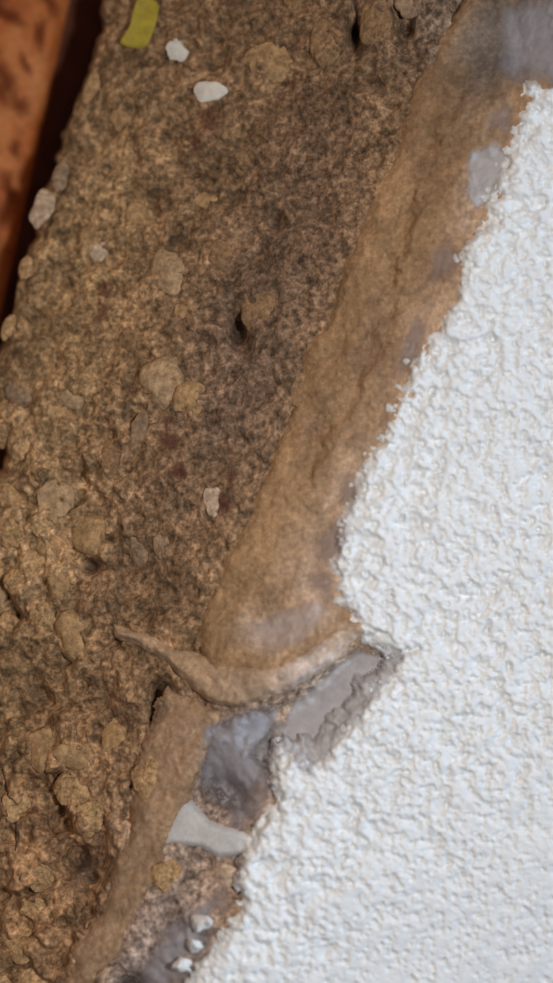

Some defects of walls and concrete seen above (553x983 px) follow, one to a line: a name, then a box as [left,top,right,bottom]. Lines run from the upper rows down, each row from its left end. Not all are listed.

spalling [29,189,56,229]
spalling [151,248,184,296]
peeling [193,0,553,672]
spalling [139,355,184,410]
spalling [7,426,31,465]
spalling [71,515,106,555]
spalling [55,610,85,662]
peeling [113,622,365,708]
peeling [248,651,403,780]
spalling [27,726,54,774]
spalling [54,772,90,807]
peeling [64,686,275,983]